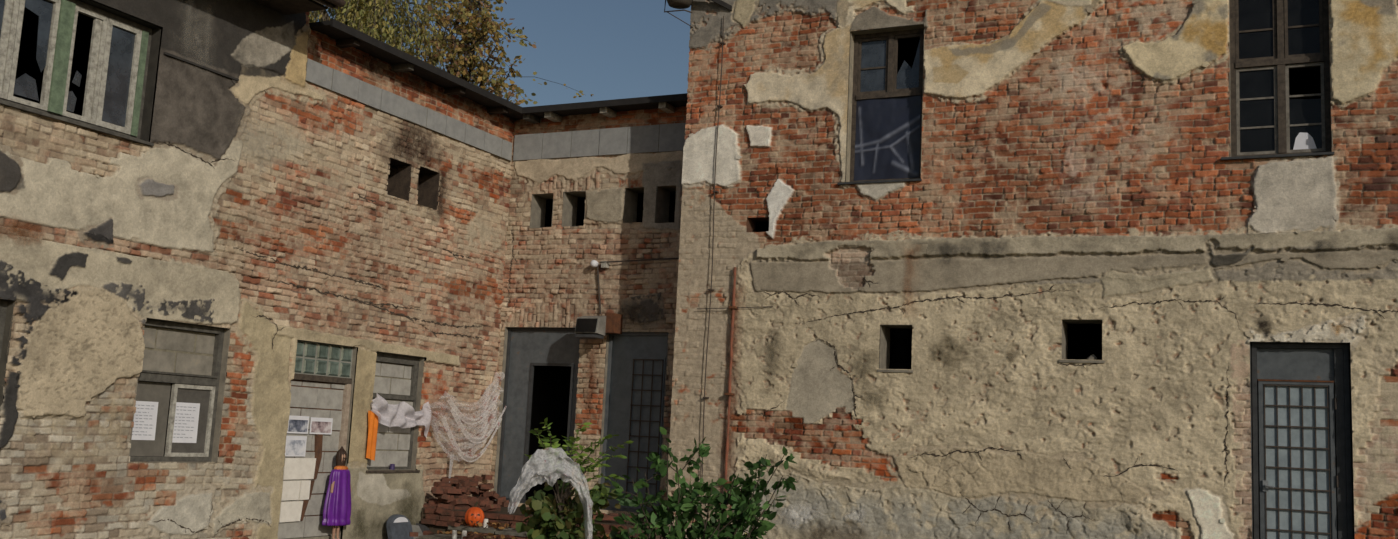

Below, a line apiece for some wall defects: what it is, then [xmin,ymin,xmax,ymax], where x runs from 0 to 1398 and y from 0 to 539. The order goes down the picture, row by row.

flaking render [923,0,1101,99]
flaking render [689,0,921,182]
spalling [0,104,159,178]
spalling [746,217,769,233]
spalling [1383,365,1398,382]
spalling [730,407,934,483]
crack [911,447,1023,460]
flaking render [13,463,252,539]
crack [959,458,1179,534]
spalling [1355,492,1398,539]